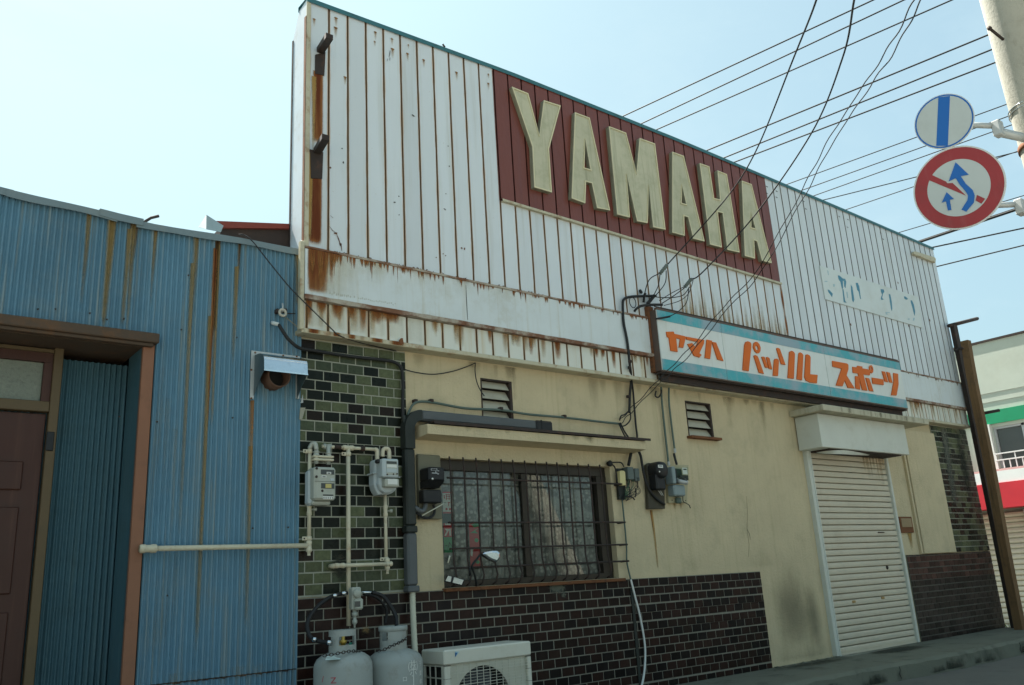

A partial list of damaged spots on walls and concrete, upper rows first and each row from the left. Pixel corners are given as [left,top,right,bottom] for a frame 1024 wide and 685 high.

corrosion [312,70,323,141]
corrosion [103,220,138,317]
corrosion [295,152,444,333]
corrosion [460,280,647,320]
corrosion [504,333,560,355]
corrosion [197,241,221,616]
damp [873,646,920,654]